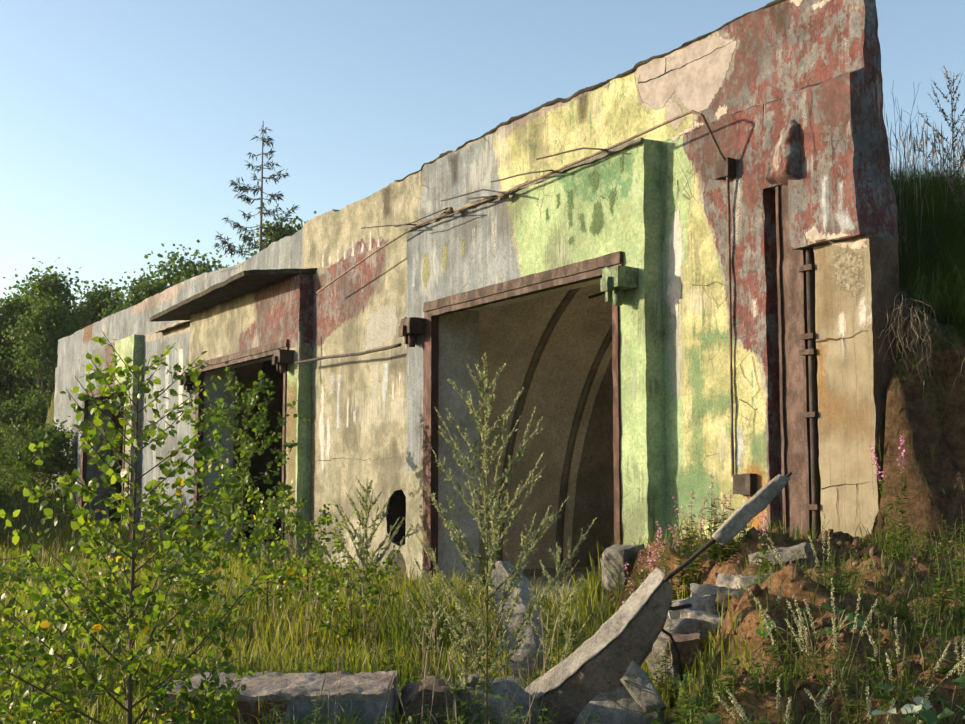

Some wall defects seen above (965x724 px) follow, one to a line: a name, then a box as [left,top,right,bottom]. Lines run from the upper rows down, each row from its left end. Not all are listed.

crack [634,39,736,107]
peeling [636,34,736,141]
crack [816,330,868,357]
rust [748,509,766,530]
crack [821,481,869,531]